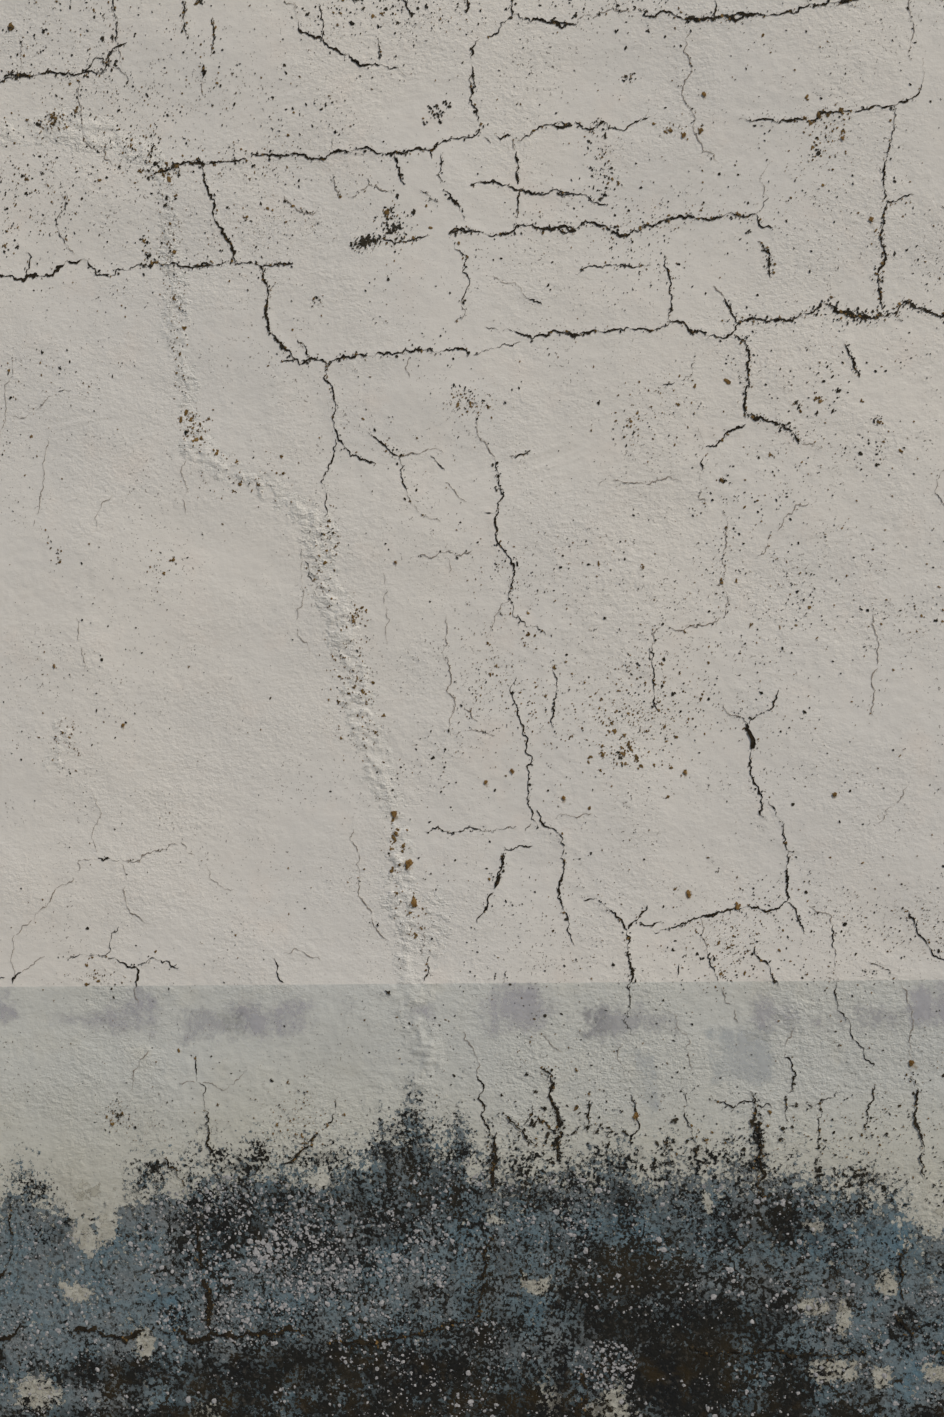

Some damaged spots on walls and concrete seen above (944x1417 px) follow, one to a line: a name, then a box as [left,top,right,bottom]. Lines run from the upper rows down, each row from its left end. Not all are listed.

crack [0,0,944,715]
crack [0,792,234,1090]
crack [350,829,388,940]
crack [430,620,875,1198]
crack [871,962,925,1178]
crack [902,907,944,960]
damp [0,1072,944,1417]